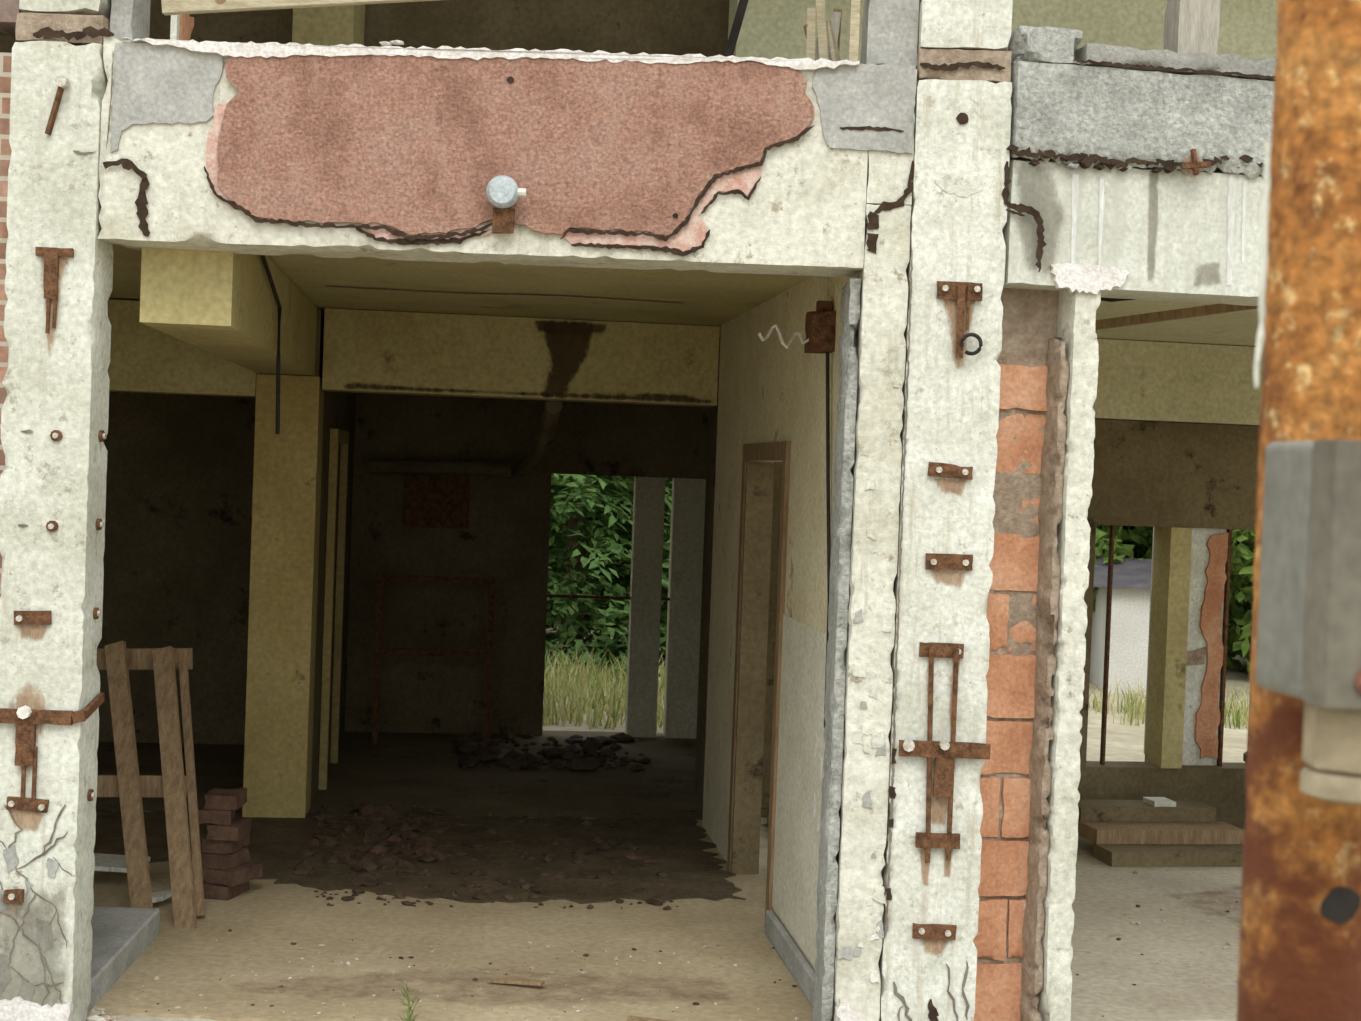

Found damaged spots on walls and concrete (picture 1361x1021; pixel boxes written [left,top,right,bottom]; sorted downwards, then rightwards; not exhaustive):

flaking render [110,37,916,252]
crack [866,161,914,254]
damp [344,321,711,403]
corrosion [945,300,975,367]
crack [885,250,913,937]
spalling [1186,532,1229,759]
corrosion [15,687,45,735]
corrosion [931,761,948,824]
crack [0,805,72,1006]
corrosion [920,848,953,885]
crack [893,961,970,1021]